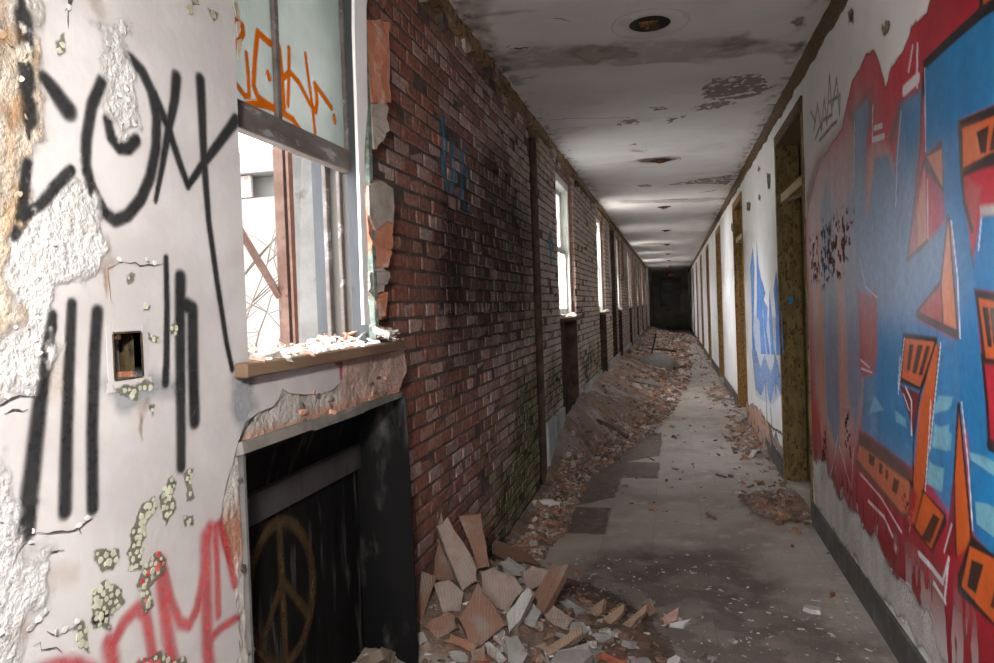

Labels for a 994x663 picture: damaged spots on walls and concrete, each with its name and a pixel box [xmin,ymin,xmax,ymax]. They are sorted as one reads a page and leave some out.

peeling [97,20,142,139]
peeling [695,74,772,111]
peeling [0,0,111,401]
spalling [242,0,407,440]
peeling [0,467,50,663]
peeling [74,469,194,652]
peeling [136,651,187,663]